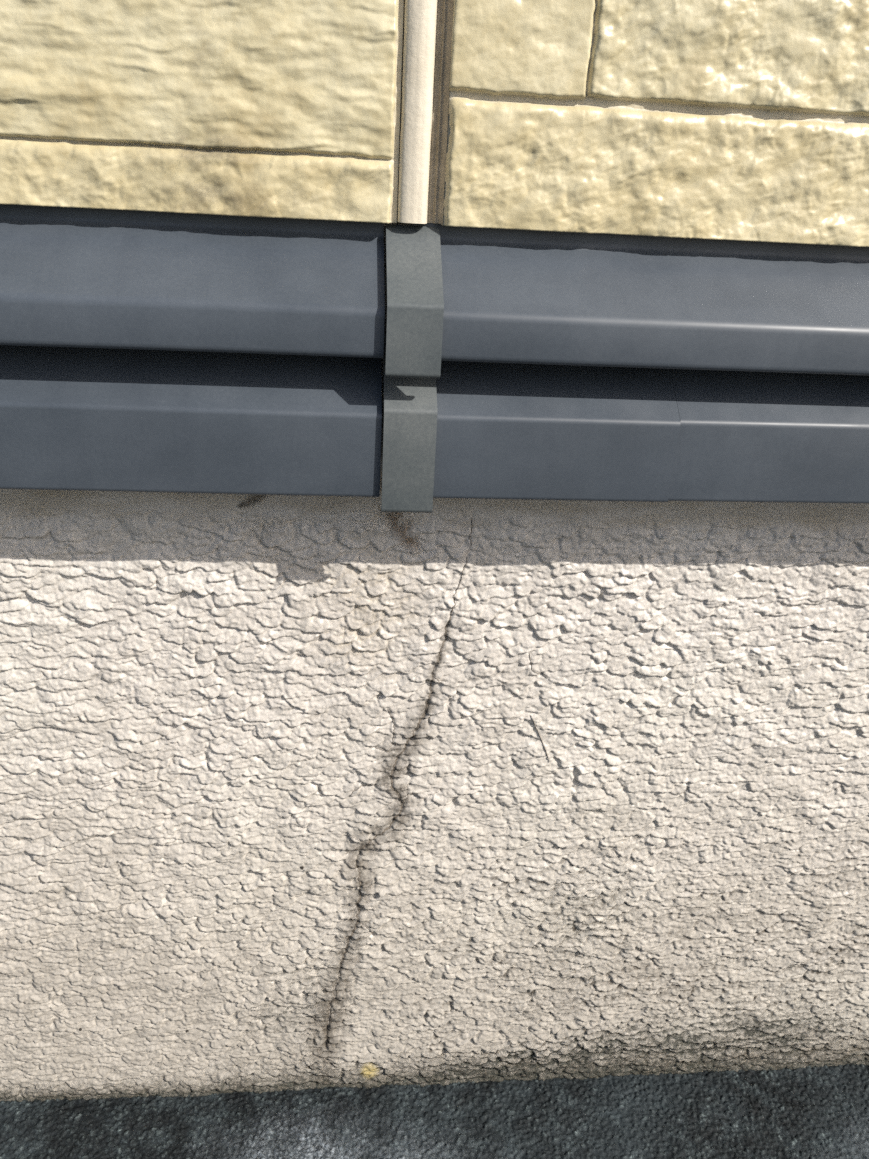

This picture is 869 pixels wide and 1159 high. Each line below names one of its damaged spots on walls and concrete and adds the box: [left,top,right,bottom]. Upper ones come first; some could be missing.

crack [327,519,473,1026]